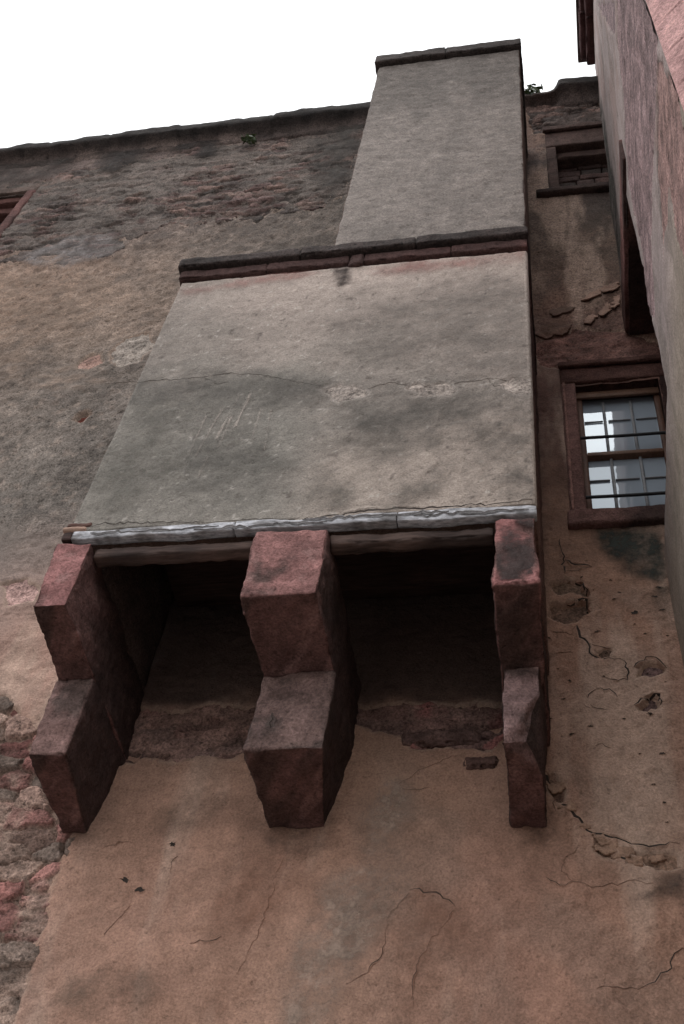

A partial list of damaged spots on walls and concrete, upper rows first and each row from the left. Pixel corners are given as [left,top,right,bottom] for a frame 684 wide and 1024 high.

flaking render [535,282,660,369]
crack [106,372,317,386]
crack [556,539,592,574]
spalling [550,579,593,624]
crack [553,625,633,711]
spalling [633,655,667,712]
flaking render [356,701,503,751]
crack [545,770,680,888]
flaking render [0,696,76,1024]
crack [347,885,456,1005]
crack [598,948,683,990]